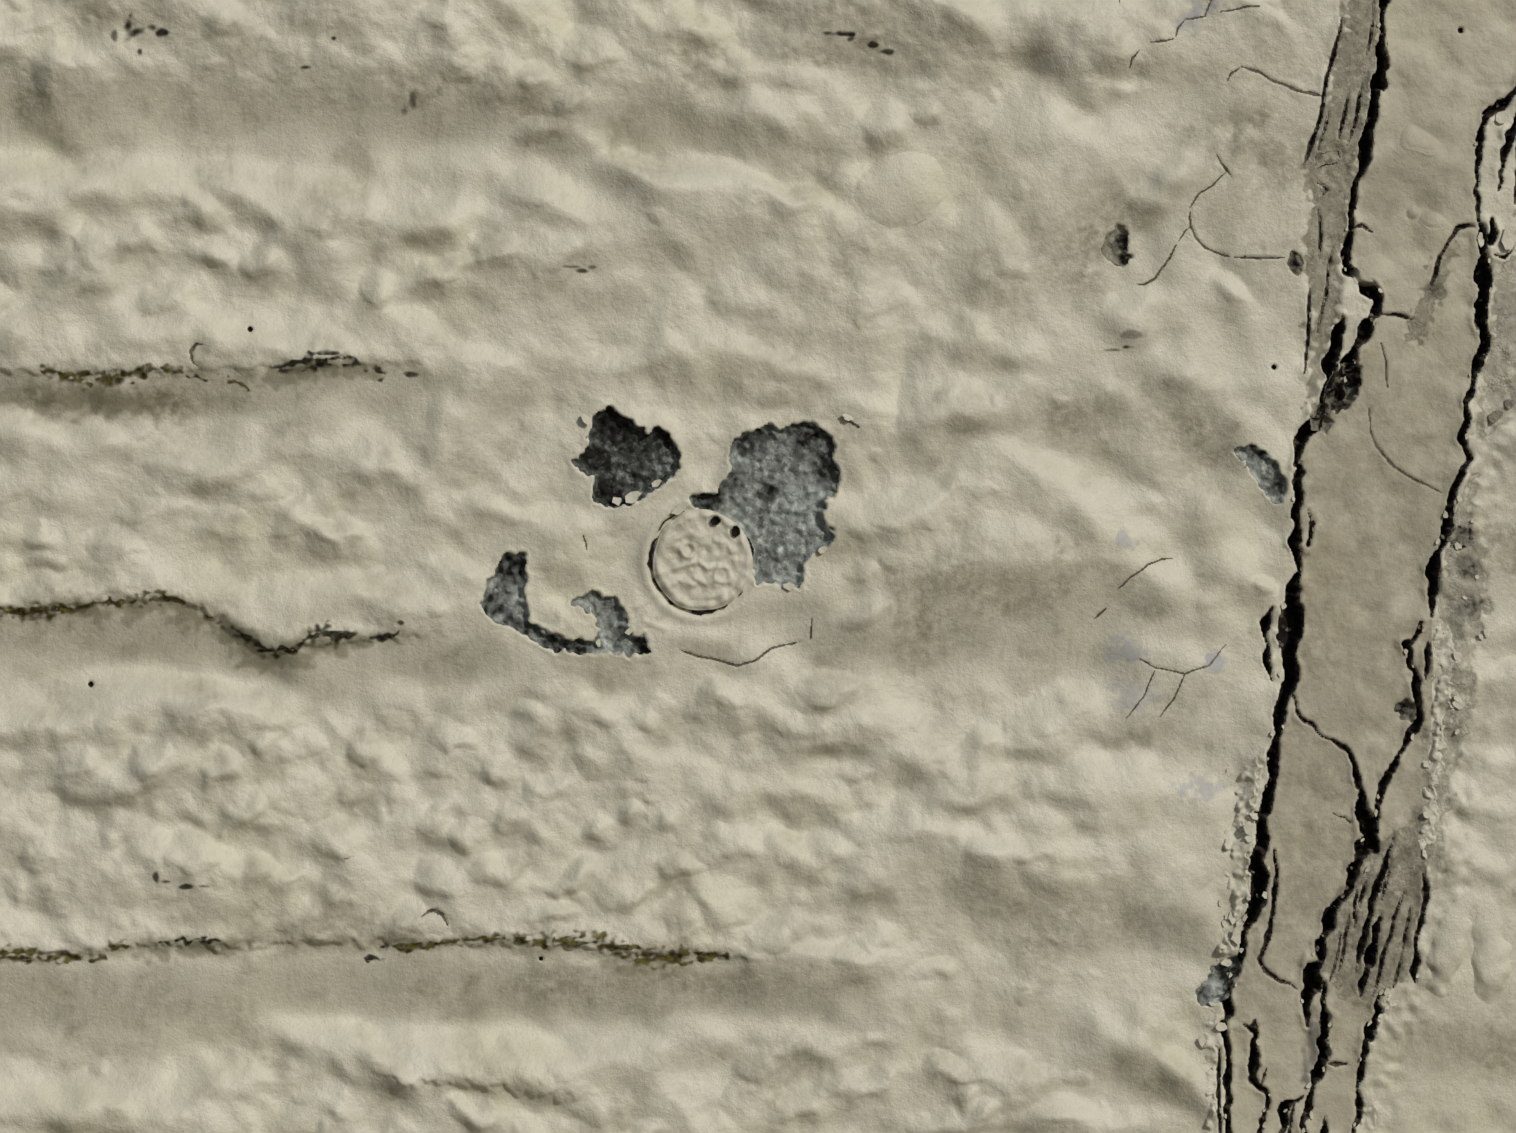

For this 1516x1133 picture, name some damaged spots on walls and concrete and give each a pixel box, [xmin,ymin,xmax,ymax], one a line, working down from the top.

spalling [1102,224,1133,267]
spalling [571,407,681,508]
spalling [671,422,840,591]
spalling [1234,445,1287,503]
spalling [479,552,651,658]
crack [1094,558,1173,619]
crack [1126,0,1516,1133]